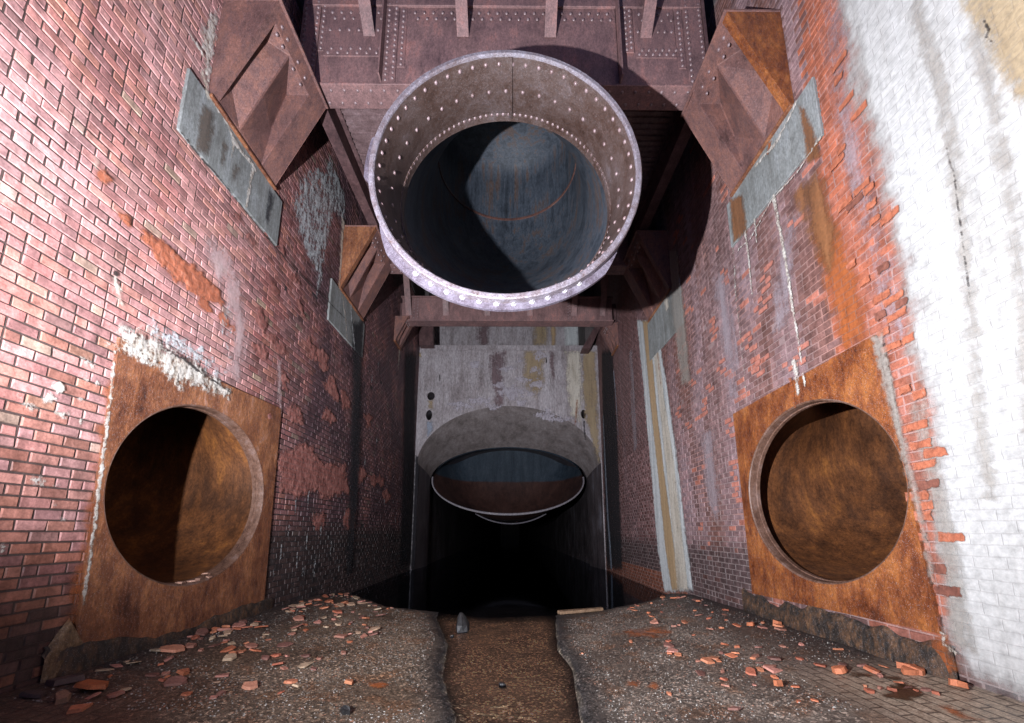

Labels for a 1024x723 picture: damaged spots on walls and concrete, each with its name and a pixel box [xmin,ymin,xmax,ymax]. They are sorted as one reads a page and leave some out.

leakage [755,101,797,168]
efflorescence [107,244,245,400]
leakage [294,158,345,294]
leakage [738,137,821,399]
corrosion [794,174,864,350]
spalling [836,176,899,227]
spalling [871,289,914,353]
efflorescence [43,382,69,419]
corrosion [71,350,116,605]
spalling [905,417,965,542]
spalling [931,564,962,597]
corrosion [932,632,956,671]